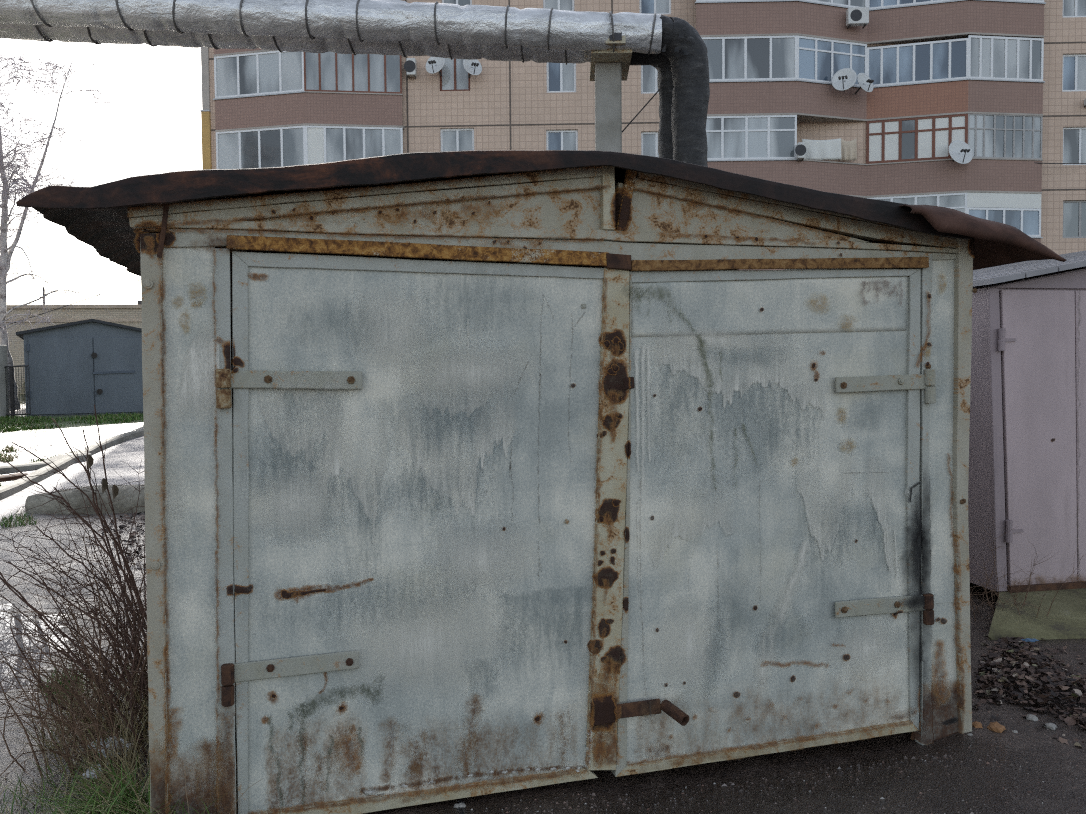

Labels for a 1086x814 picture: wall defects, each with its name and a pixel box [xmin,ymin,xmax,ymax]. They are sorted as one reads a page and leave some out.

corrosion [128,166,611,263]
corrosion [513,185,761,233]
corrosion [663,220,845,257]
corrosion [159,278,244,622]
corrosion [216,579,253,607]
corrosion [251,275,965,814]
corrosion [150,635,238,814]